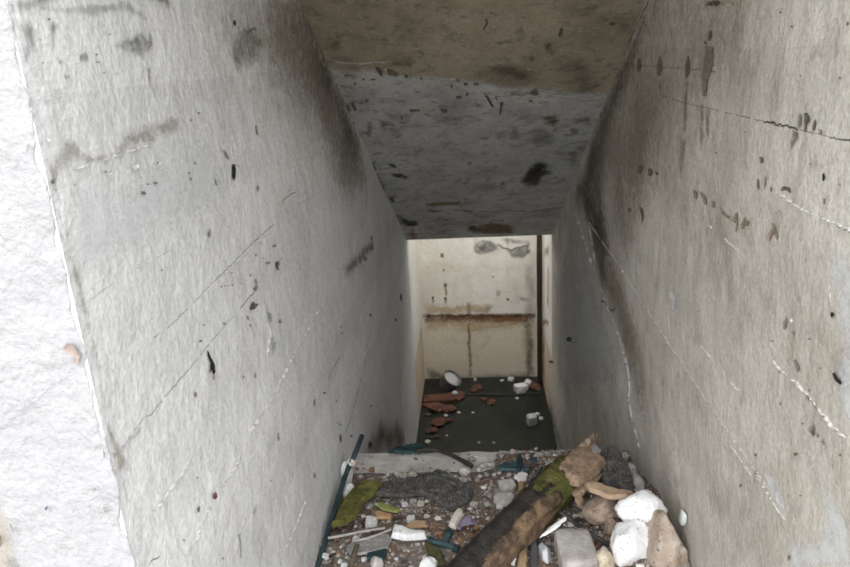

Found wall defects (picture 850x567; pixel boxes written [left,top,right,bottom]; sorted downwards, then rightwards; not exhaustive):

damp [234,0,356,167]
crack [763,121,798,130]
damp [522,162,550,185]
rust [424,313,534,376]